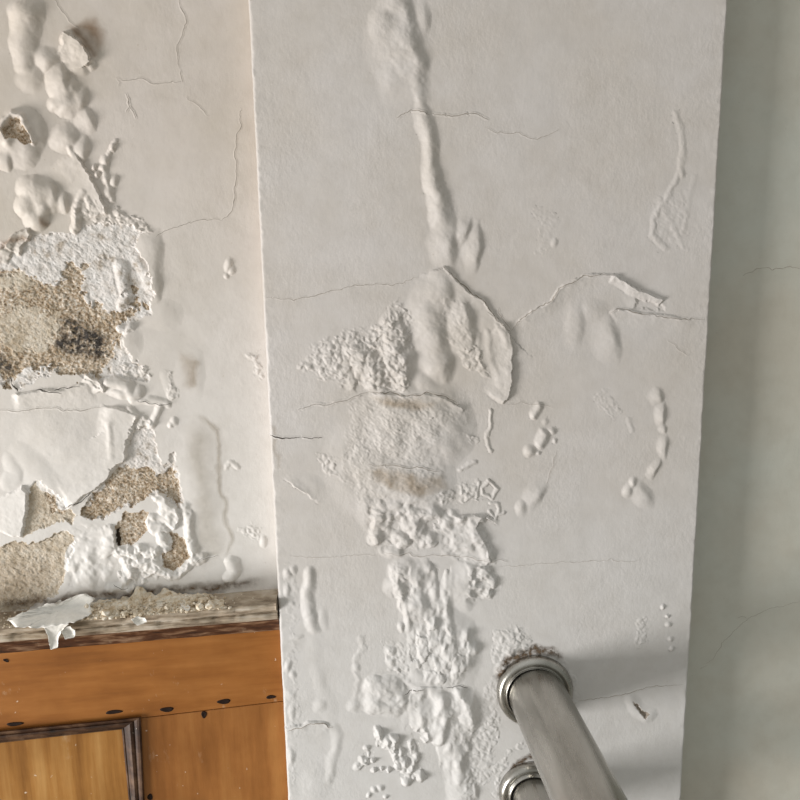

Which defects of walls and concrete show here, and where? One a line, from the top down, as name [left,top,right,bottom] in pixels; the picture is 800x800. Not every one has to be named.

crack [115,0,209,120]
crack [396,107,559,141]
crack [155,107,243,238]
crack [266,276,419,302]
crack [443,265,614,333]
crack [609,306,705,322]
crack [0,377,104,413]
flaking render [0,204,201,612]
peeling [474,565,500,601]
peeling [623,691,659,725]